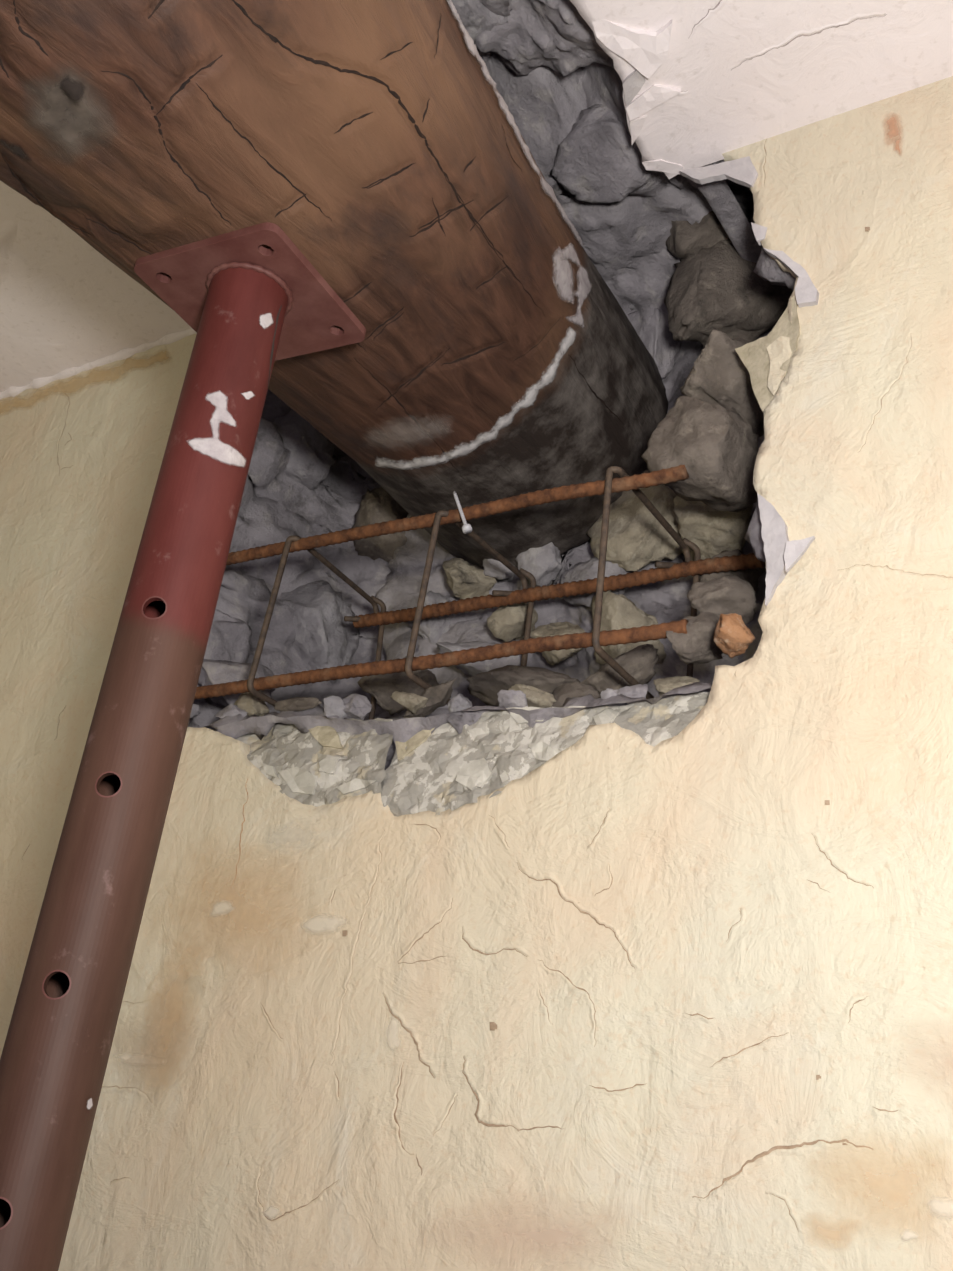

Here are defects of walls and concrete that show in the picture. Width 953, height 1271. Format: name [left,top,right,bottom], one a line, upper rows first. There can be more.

crack [102,55,332,225]
crack [232,0,545,316]
peeling [592,18,681,145]
peeling [642,156,758,188]
crack [730,12,887,70]
peeling [735,222,819,413]
peeling [757,493,815,606]
spalling [236,692,710,817]
crack [487,808,639,969]
crack [808,831,878,892]
crack [383,898,596,1175]
crack [692,1107,902,1232]